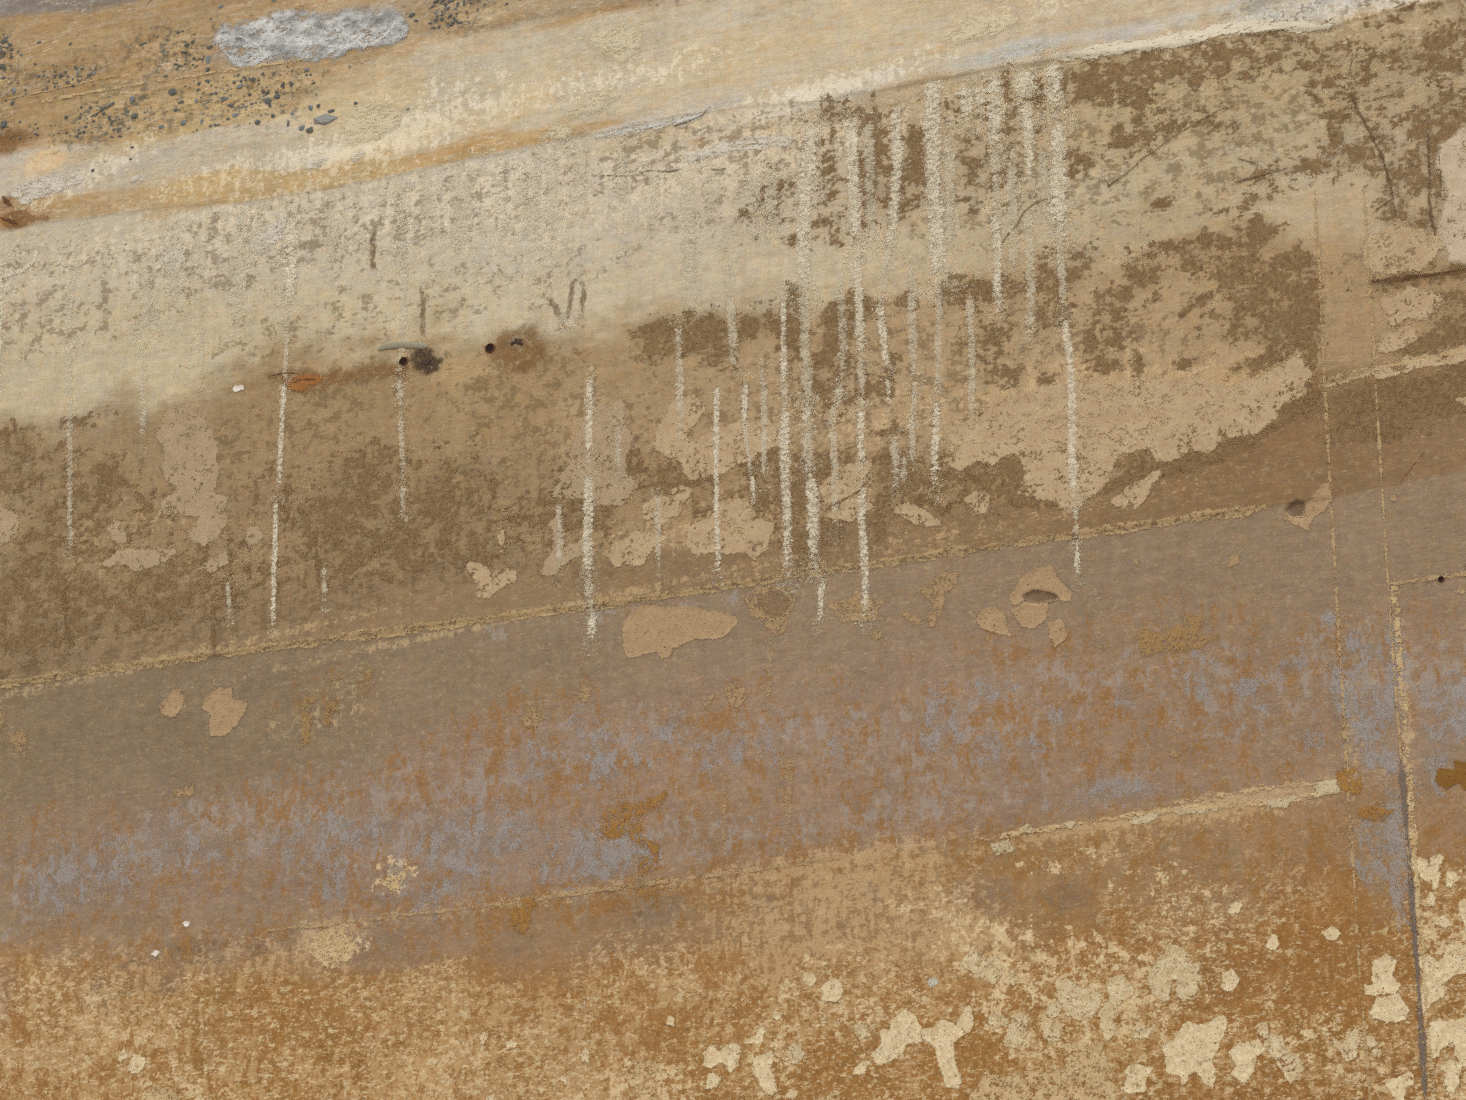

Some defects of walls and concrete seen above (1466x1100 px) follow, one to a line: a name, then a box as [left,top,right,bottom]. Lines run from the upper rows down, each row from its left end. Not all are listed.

leakage [10,175,84,204]
leakage [58,221,88,556]
leakage [197,194,346,648]
leakage [369,18,1334,656]
peeling [943,126,1466,509]
rust [1132,614,1217,655]
rust [598,793,666,896]
rust [1336,767,1394,820]
rust [1435,760,1466,790]
peeling [702,1012,806,1100]
peeling [853,943,1304,1100]
peeling [1333,854,1466,1094]